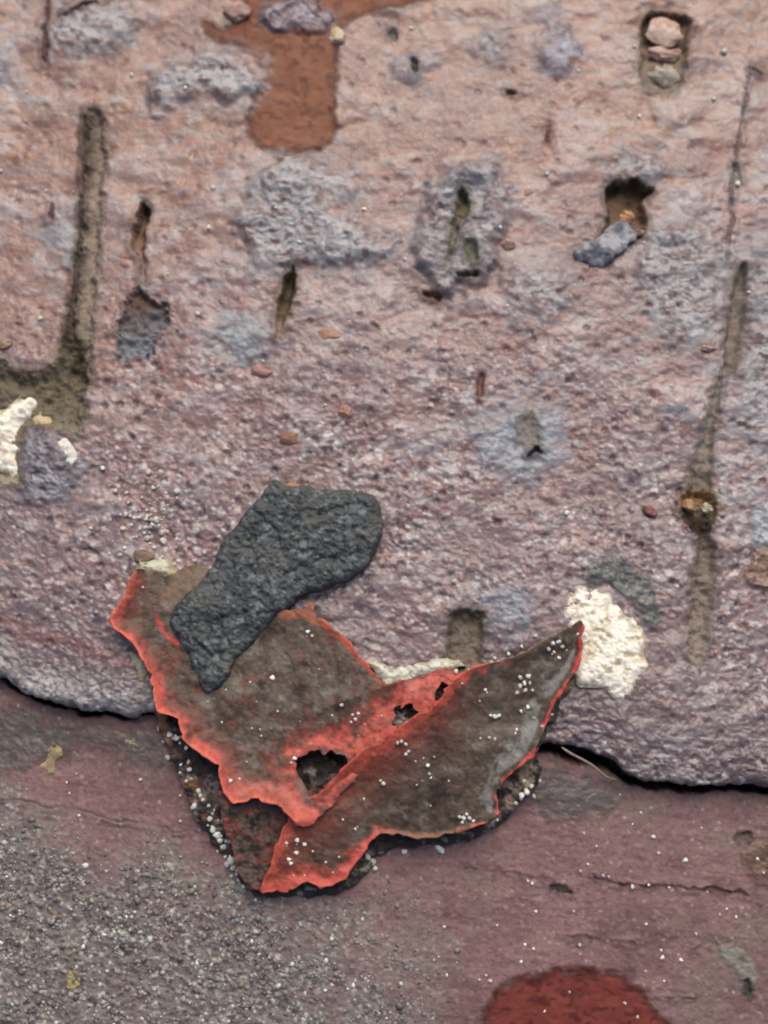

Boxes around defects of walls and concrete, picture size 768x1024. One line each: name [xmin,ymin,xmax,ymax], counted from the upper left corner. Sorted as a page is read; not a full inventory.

spalling [637,8,694,94]
leakage [47,226,76,266]
spalling [573,177,655,268]
leakage [15,426,86,504]
leakage [587,558,659,627]
crack [549,875,742,895]